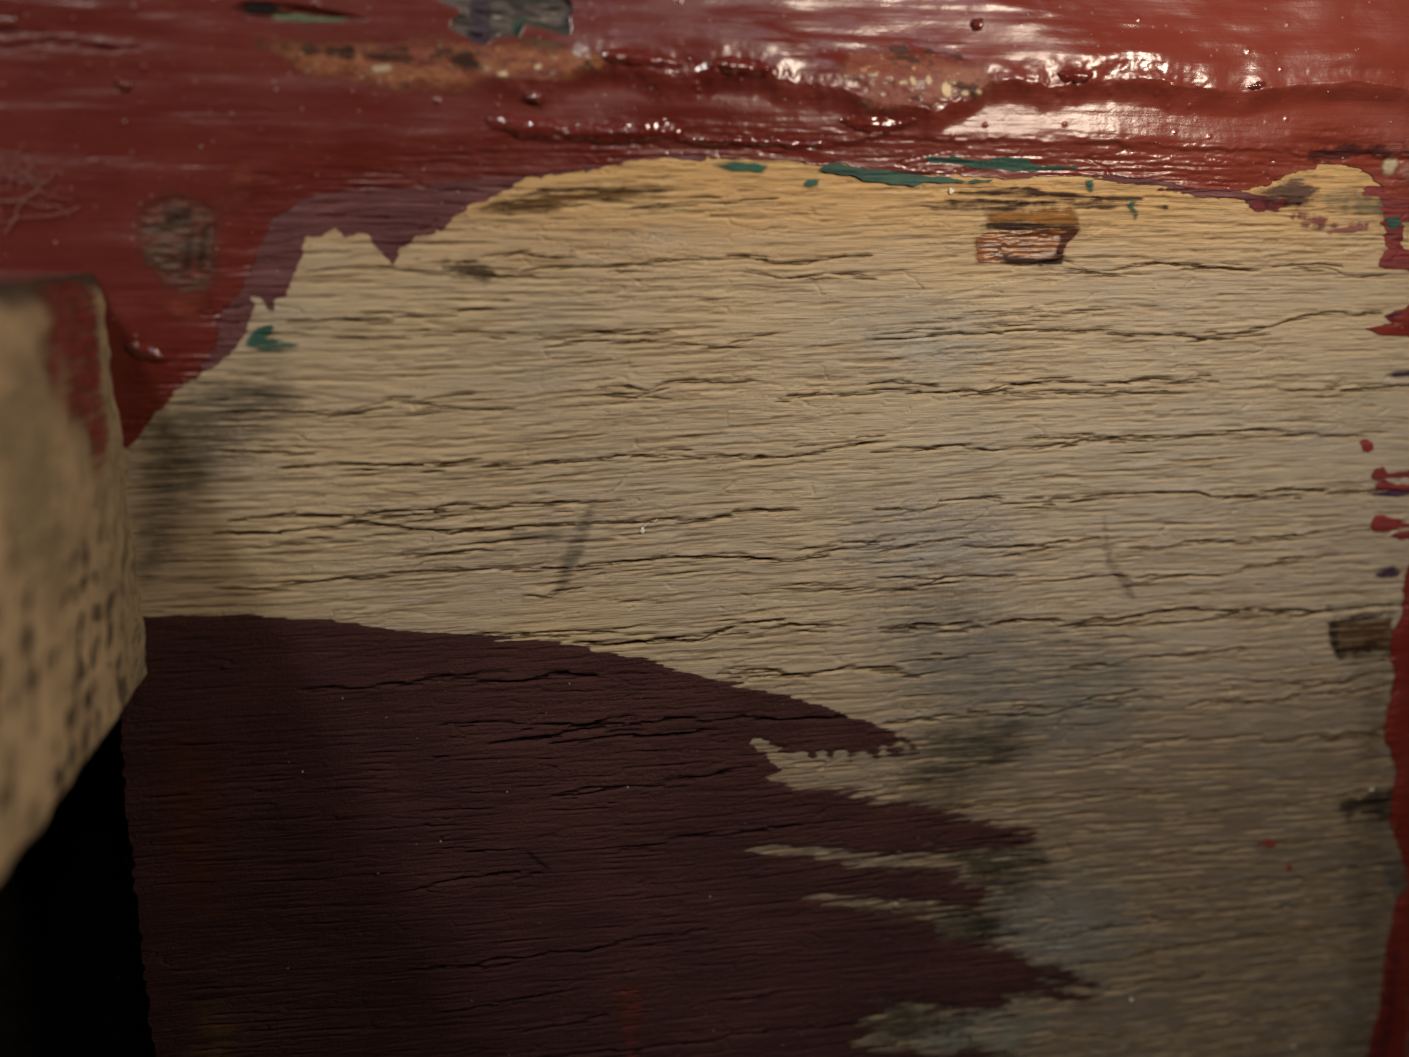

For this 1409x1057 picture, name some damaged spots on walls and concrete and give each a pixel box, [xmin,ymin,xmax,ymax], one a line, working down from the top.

peeling [229,1,367,21]
peeling [258,0,604,91]
crack [471,187,776,212]
peeling [1264,179,1320,204]
peeling [139,193,217,290]
peeling [976,207,1079,264]
crack [285,250,1409,402]
crack [217,393,512,418]
crack [213,429,1403,809]
crack [616,824,802,852]
crack [400,847,541,893]
crack [407,929,862,1057]